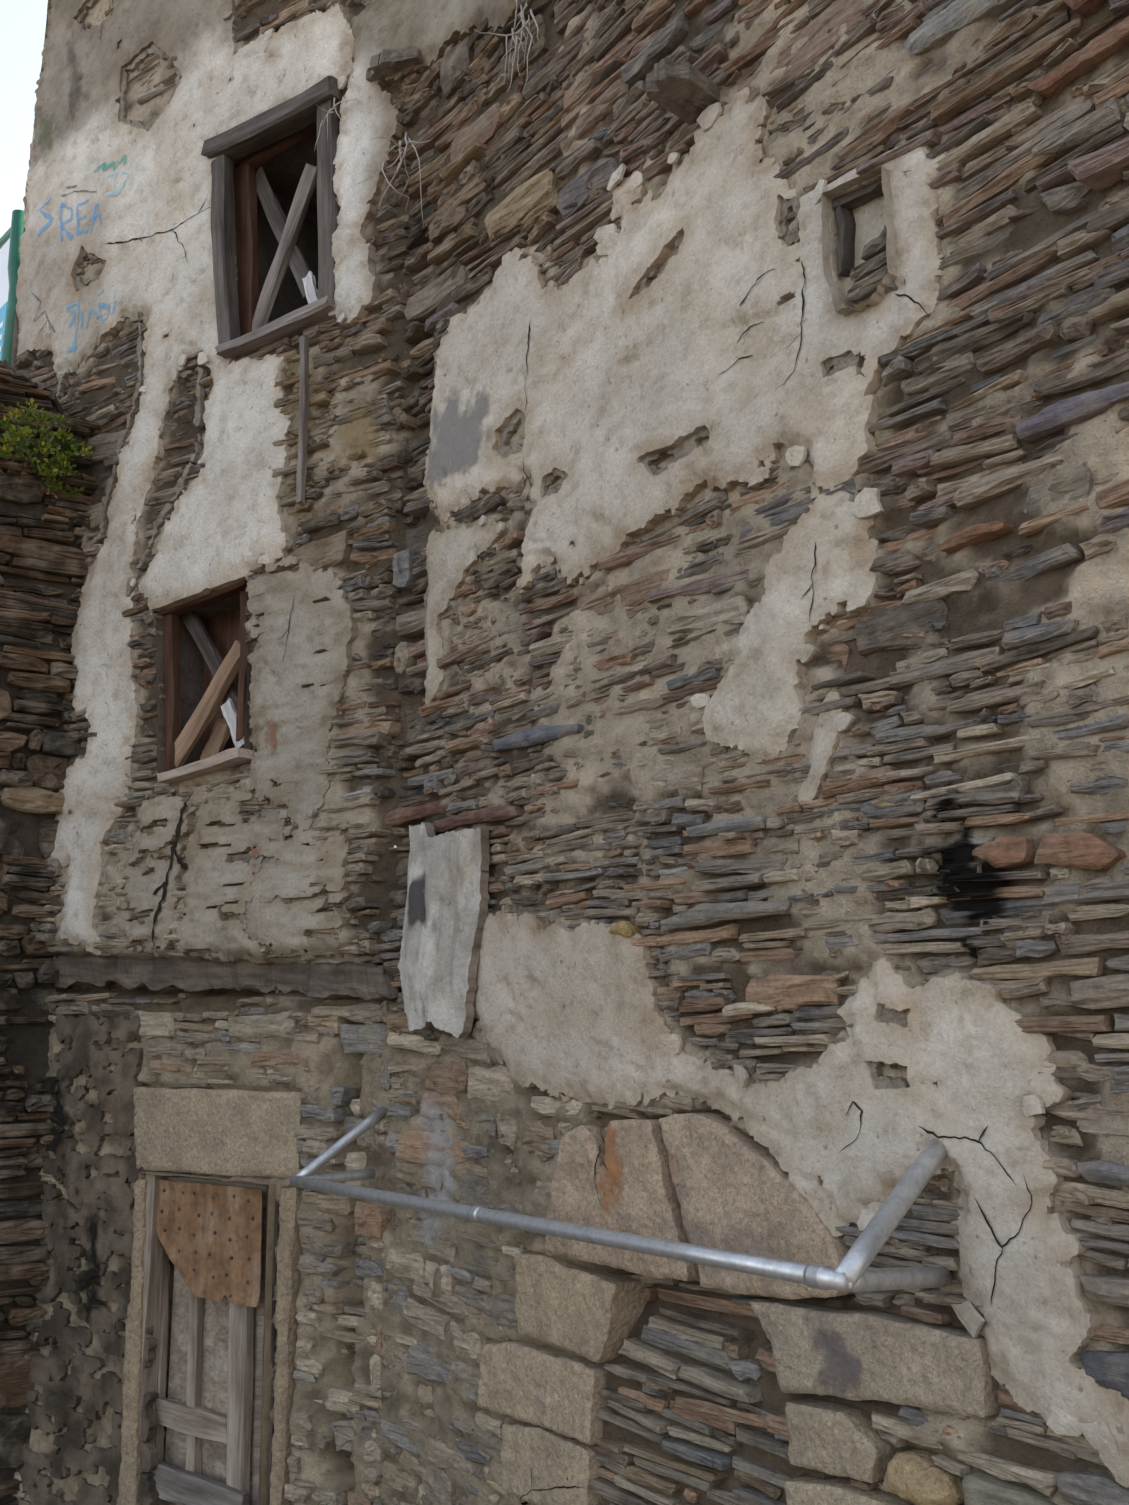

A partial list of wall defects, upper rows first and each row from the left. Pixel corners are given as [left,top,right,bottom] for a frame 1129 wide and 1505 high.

crack [102,199,210,261]
flaking render [15,0,520,955]
crack [919,1126,1033,1303]